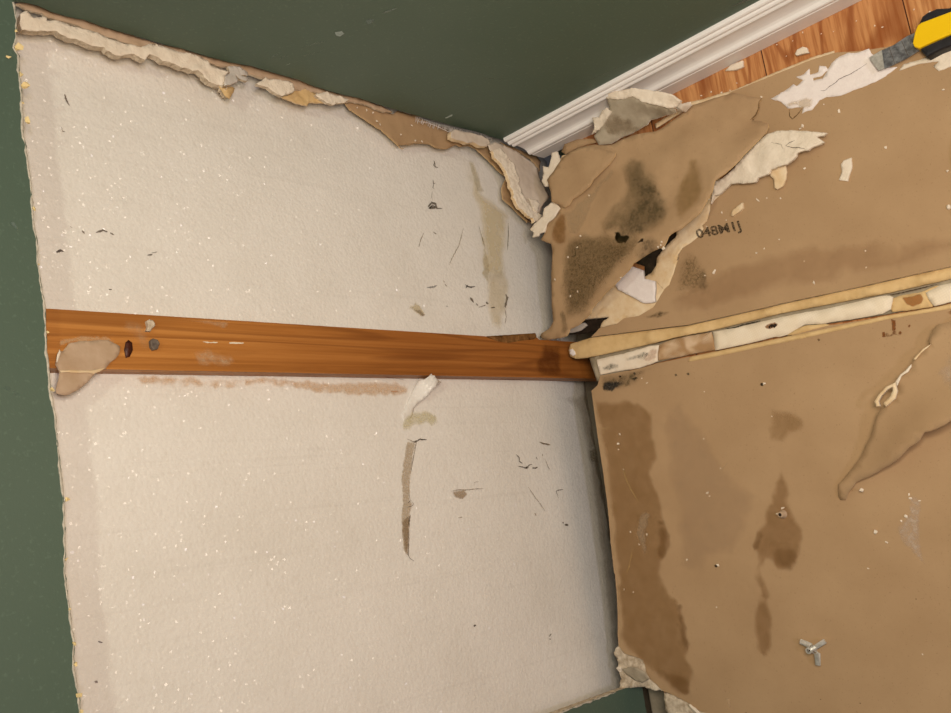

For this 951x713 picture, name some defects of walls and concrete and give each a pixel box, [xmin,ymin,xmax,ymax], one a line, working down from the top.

spalling [223,66,295,98]
spalling [314,92,349,106]
spalling [402,439,427,561]